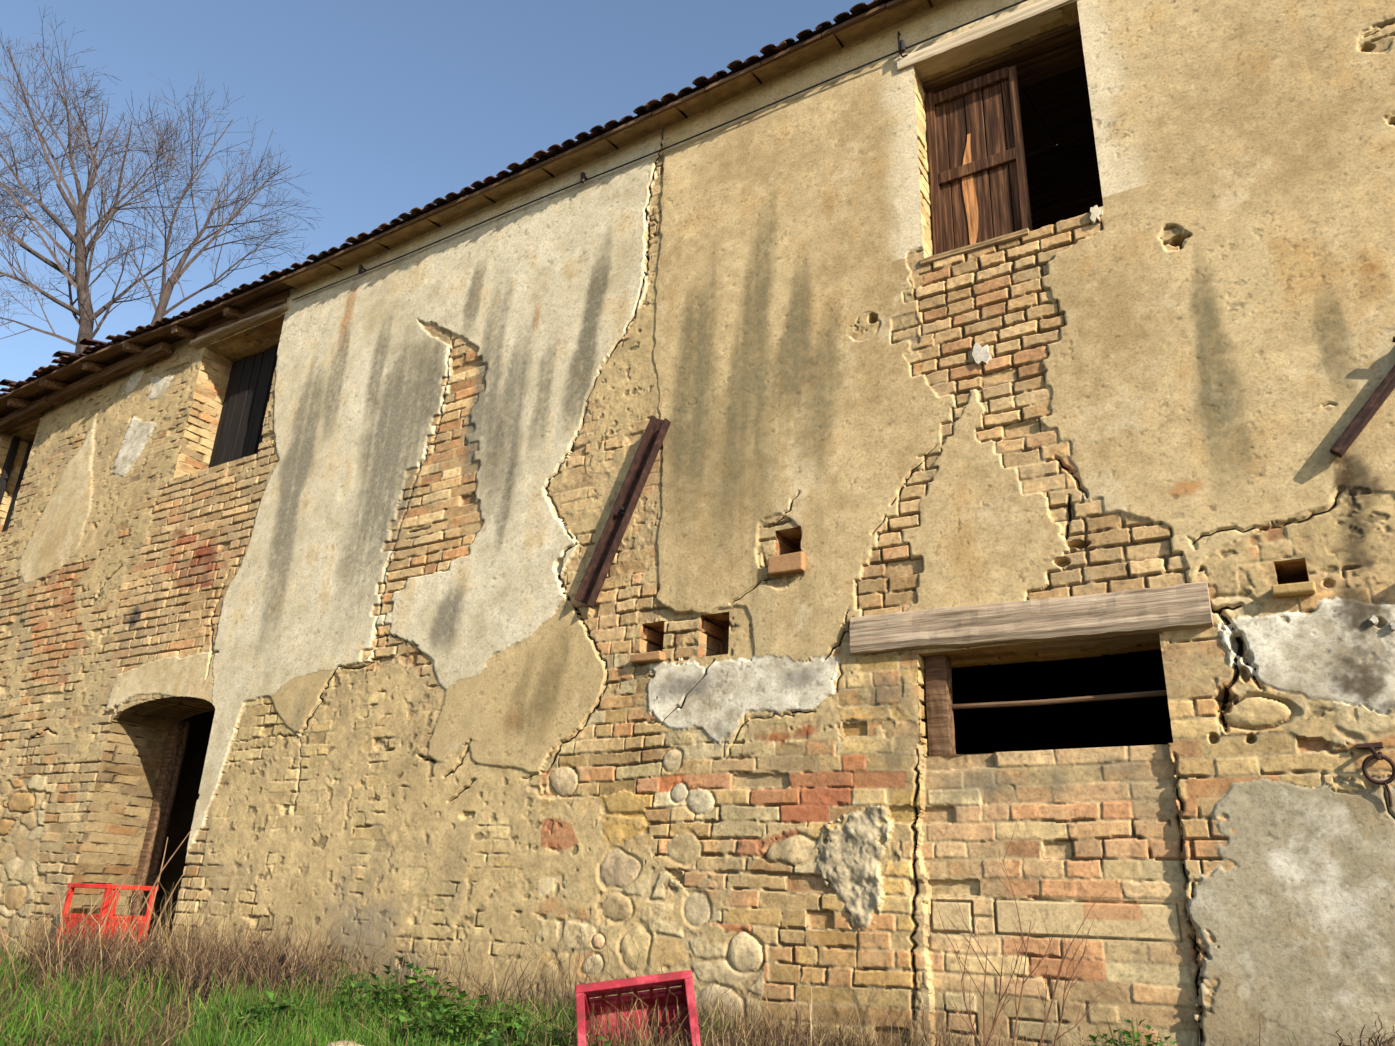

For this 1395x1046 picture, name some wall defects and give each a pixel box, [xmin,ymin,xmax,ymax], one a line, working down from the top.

water stain [265,345,348,620]
water stain [349,338,441,562]
water stain [467,321,537,529]
spalling [170,161,847,1039]
water stain [566,259,607,411]
crack [523,133,663,779]
water stain [670,297,712,480]
spalling [843,205,1395,901]
water stain [1338,455,1382,567]
water stain [1339,587,1381,630]
water stain [1334,651,1392,709]
spalling [1191,918,1214,1016]